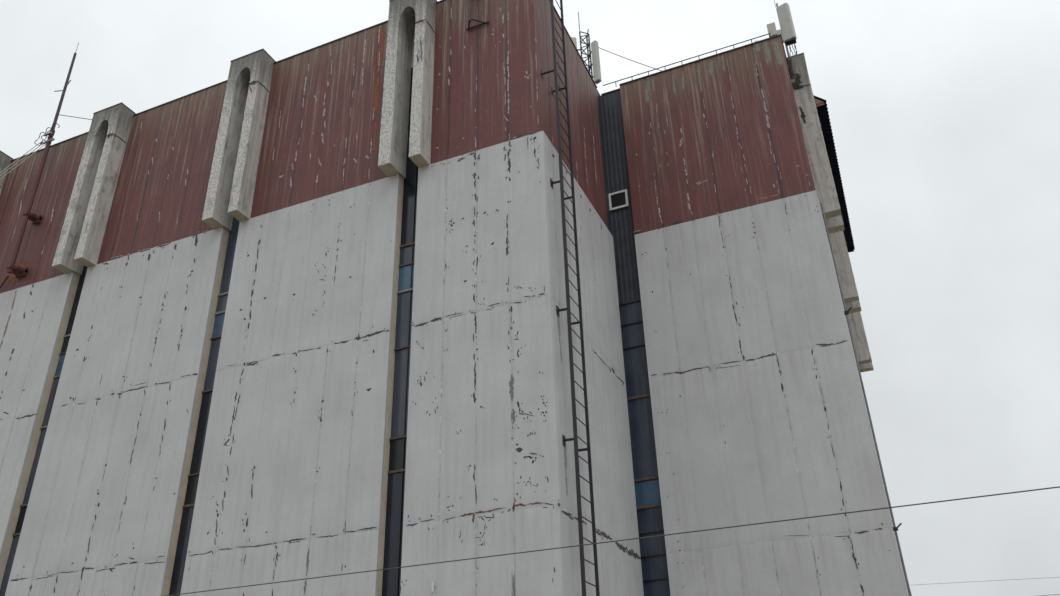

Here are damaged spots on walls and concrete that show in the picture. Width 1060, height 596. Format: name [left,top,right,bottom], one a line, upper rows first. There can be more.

rust [372,28,384,152]
crack [0,348,36,420]
crack [11,136,545,596]
peeling [509,374,547,464]
crack [593,350,625,384]
crack [651,275,784,392]
crack [460,465,641,559]